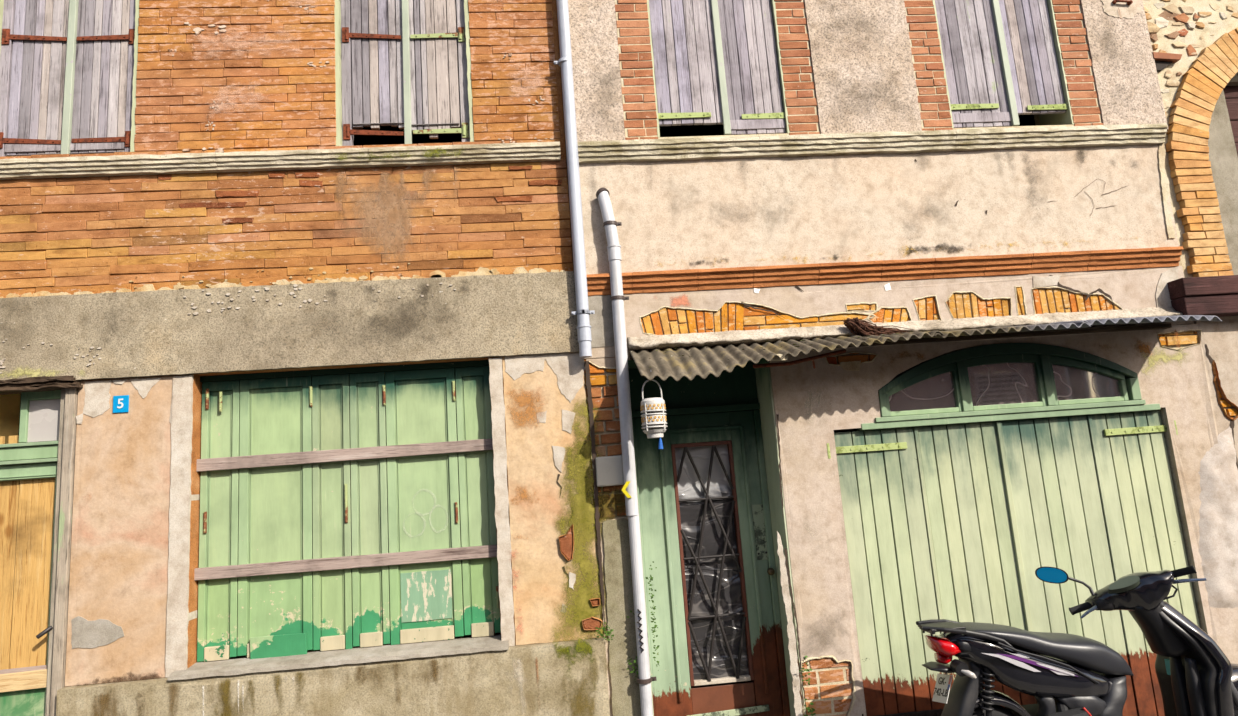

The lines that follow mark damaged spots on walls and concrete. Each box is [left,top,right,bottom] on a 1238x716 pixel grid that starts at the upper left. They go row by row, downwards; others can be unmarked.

spalling [639,286,1123,335]
peeling [75,378,161,424]
peeling [505,353,622,472]
spalling [1212,360,1238,421]
flaking render [594,485,628,524]
spalling [558,524,576,590]
spalling [582,598,603,630]
spalling [776,531,856,716]
damp [203,679,254,716]